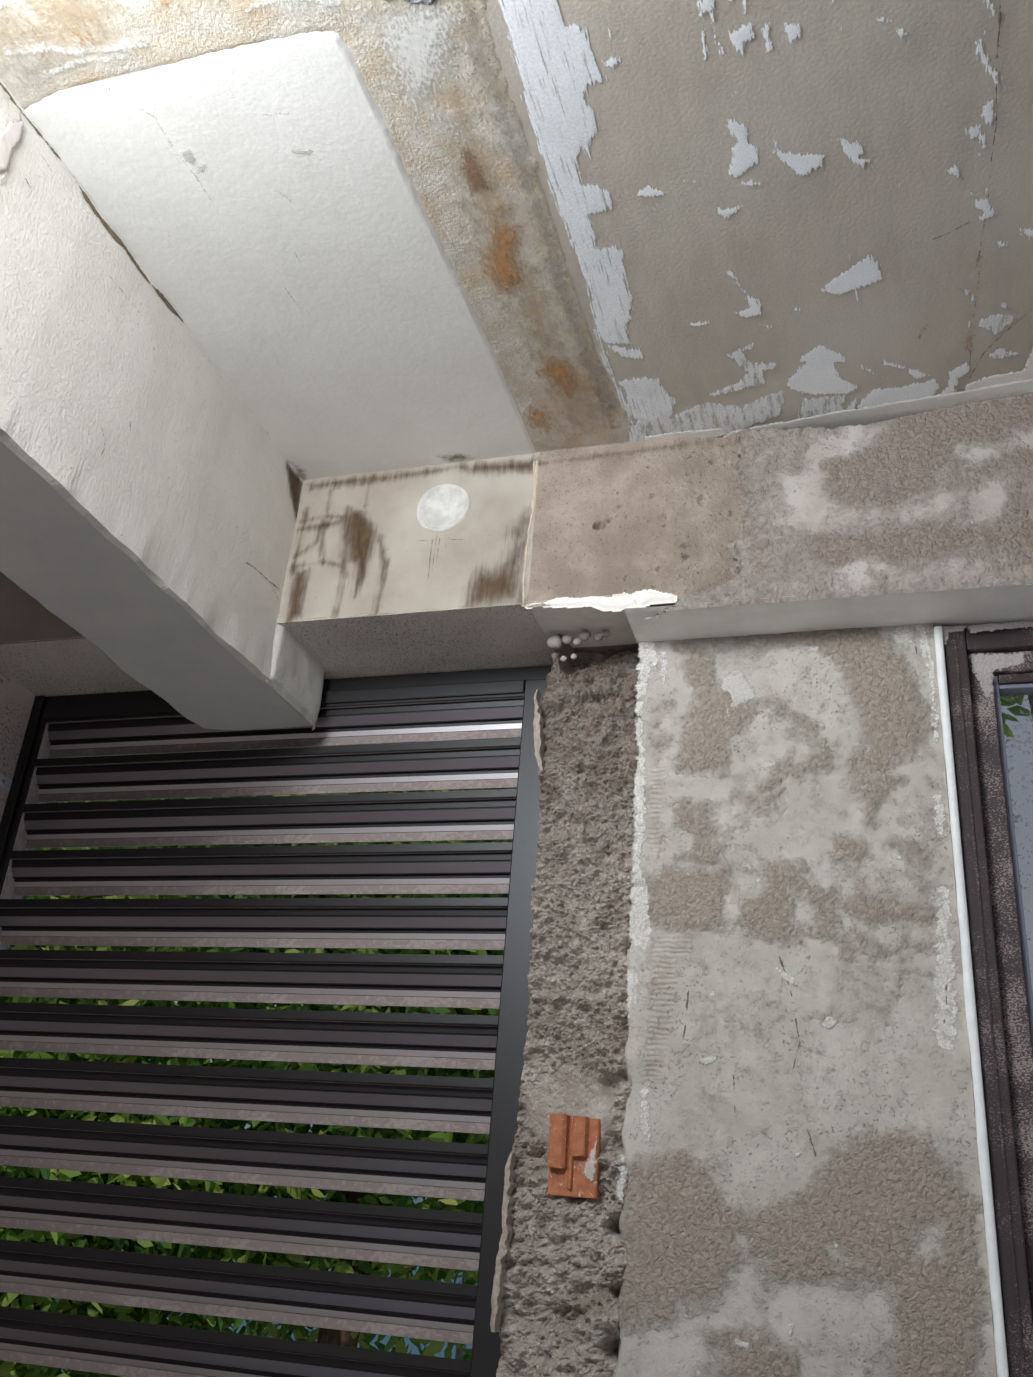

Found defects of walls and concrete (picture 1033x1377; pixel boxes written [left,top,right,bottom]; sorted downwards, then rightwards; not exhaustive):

crack [991,5,1001,161]
corrosion [458,147,522,288]
spalling [0,0,1033,608]
damp [287,555,307,622]
damp [287,463,388,580]
damp [322,474,408,486]
damp [450,456,533,472]
damp [471,532,524,604]